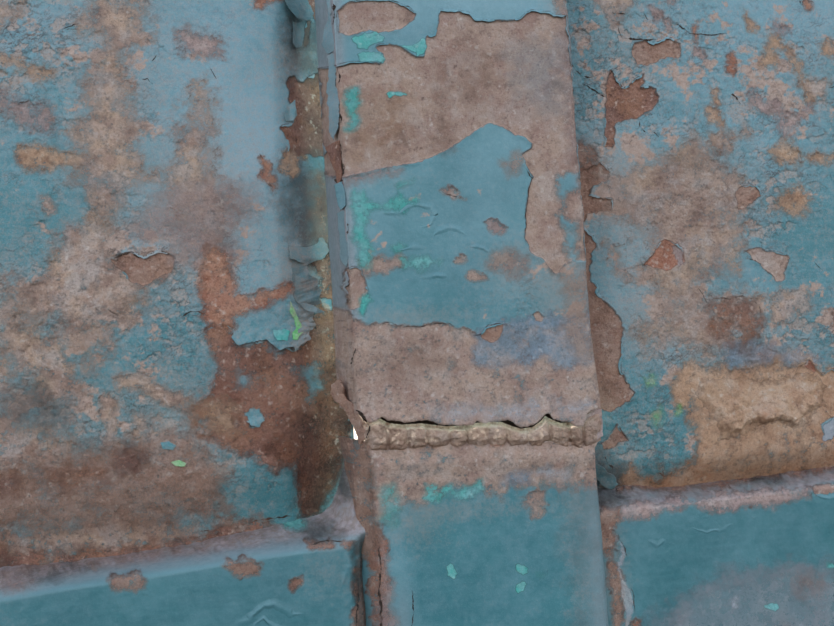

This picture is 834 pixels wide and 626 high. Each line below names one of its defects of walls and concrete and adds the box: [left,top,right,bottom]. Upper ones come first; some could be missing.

peeling [603,37,681,147]
peeling [111,250,175,286]
peeling [232,237,329,352]
rust [0,0,601,626]
peeling [280,0,634,449]
peeling [645,239,685,271]
rust [578,88,809,350]
peeling [747,248,789,281]
peeling [247,416,265,427]
crack [356,410,480,439]
crack [500,414,566,429]
rust [600,358,834,626]